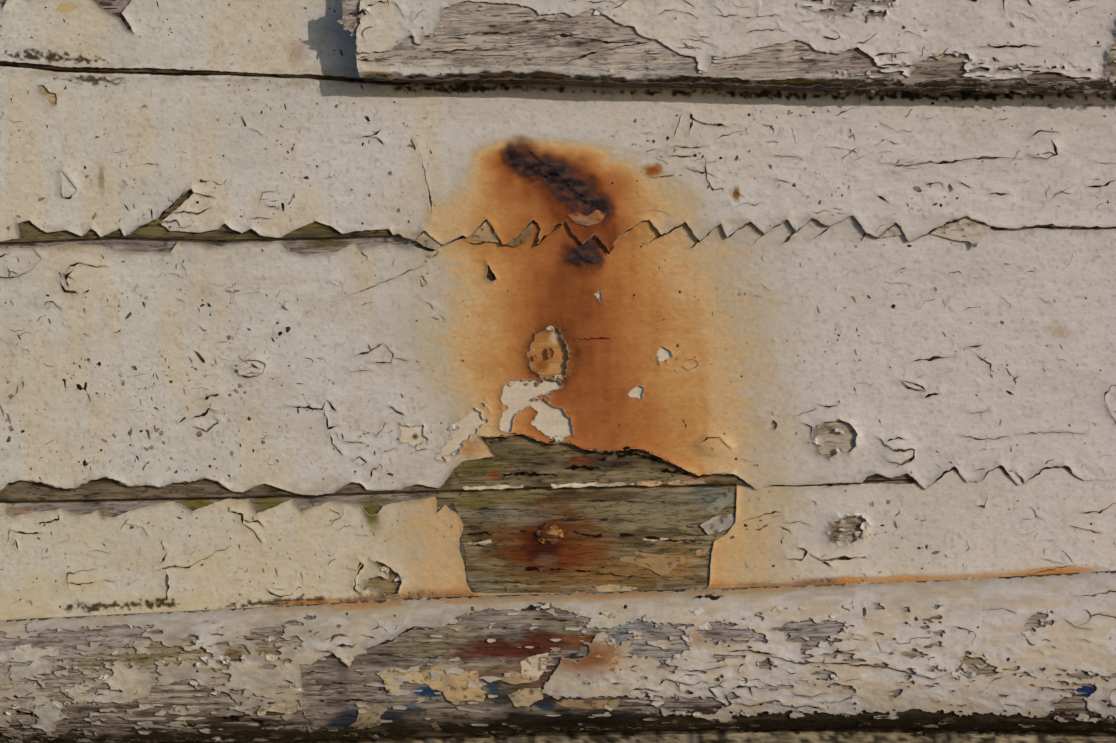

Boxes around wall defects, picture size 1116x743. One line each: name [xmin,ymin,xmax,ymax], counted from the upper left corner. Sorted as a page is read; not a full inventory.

peeling [38,85,57,107]
peeling [97,0,132,31]
peeling [0,61,347,82]
crack [347,0,427,66]
crack [433,0,948,66]
peeling [337,0,1116,95]
crack [971,0,1041,73]
peeling [0,189,426,255]
rust [424,138,1094,594]
rust [270,497,483,609]
peeling [0,326,1116,743]